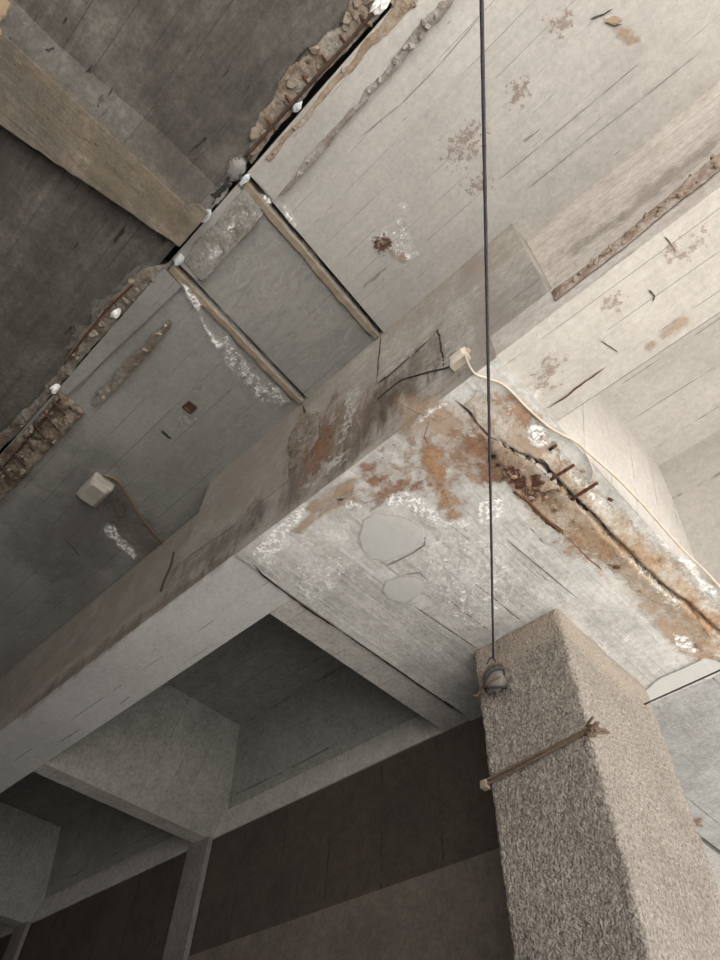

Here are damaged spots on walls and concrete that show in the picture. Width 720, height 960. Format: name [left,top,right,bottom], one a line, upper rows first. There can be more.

spalling [244,0,454,196]
leakage [369,220,415,260]
spalling [551,153,720,300]
spalling [0,188,263,501]
leakage [182,284,286,402]
crack [377,329,444,383]
leakage [104,524,137,559]
leakage [253,385,364,568]
corrosion [289,388,563,532]
spalling [465,390,720,660]